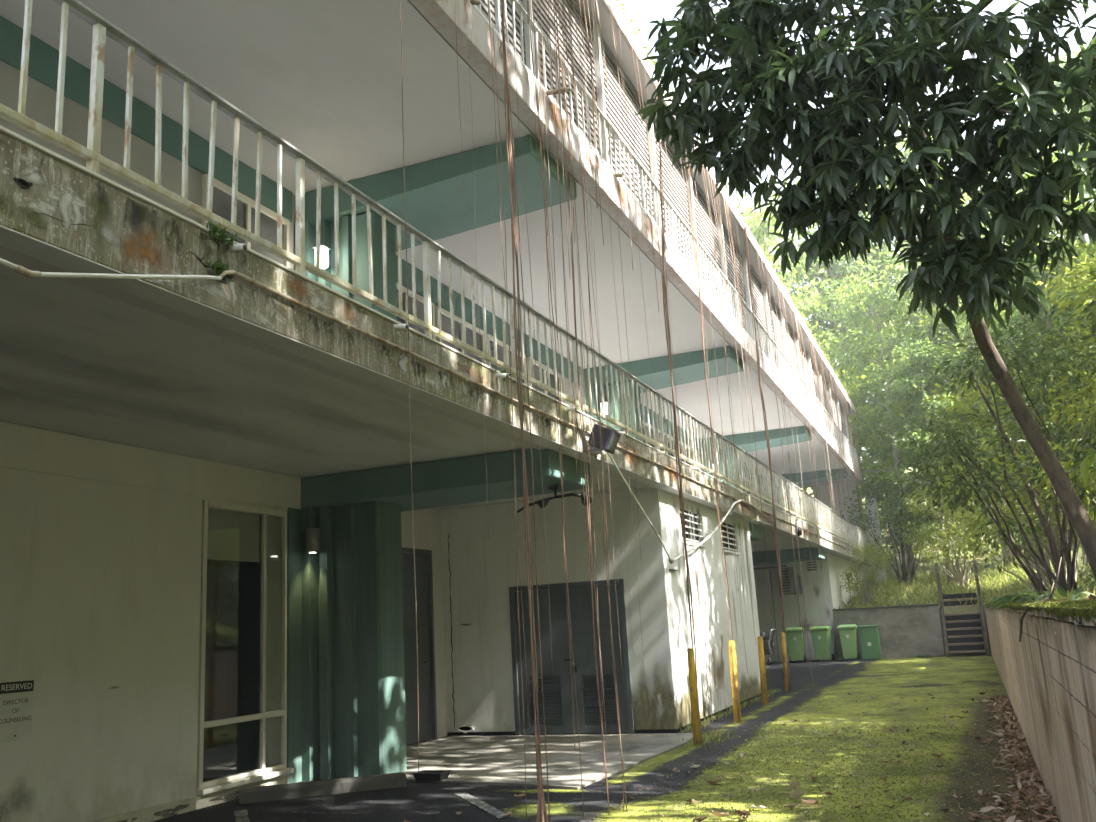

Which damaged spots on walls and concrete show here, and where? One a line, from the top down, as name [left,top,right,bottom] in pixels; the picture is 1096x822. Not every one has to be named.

damp [60,192,82,229]